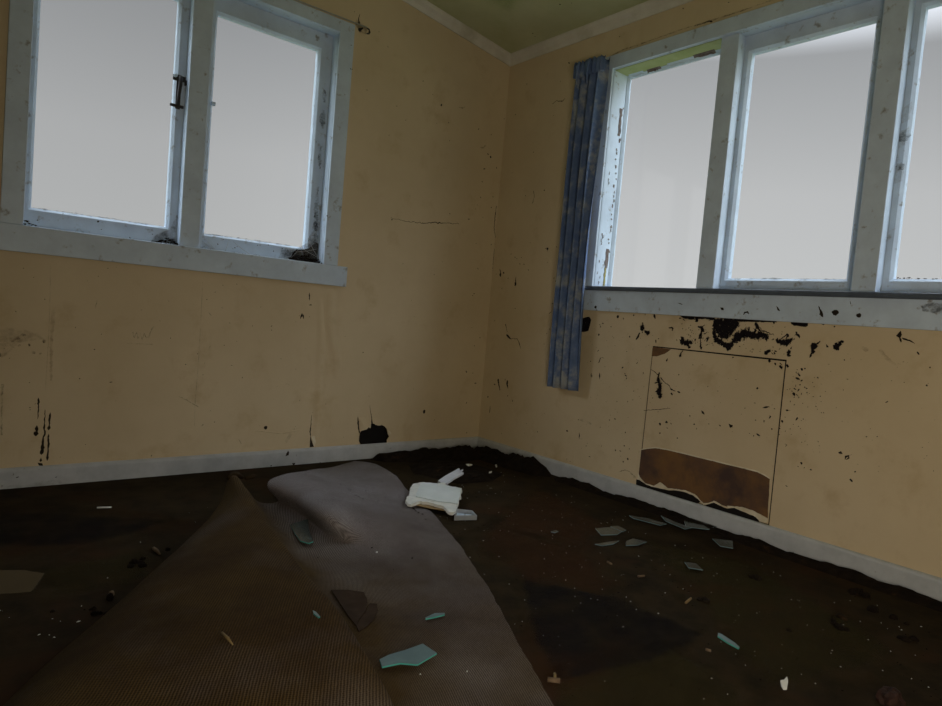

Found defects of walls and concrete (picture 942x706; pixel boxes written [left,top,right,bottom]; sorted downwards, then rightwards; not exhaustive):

peeling [652,347,671,356]
damp [636,362,680,399]
damp [669,303,845,447]
spalling [357,411,392,444]
peeling [637,447,770,522]